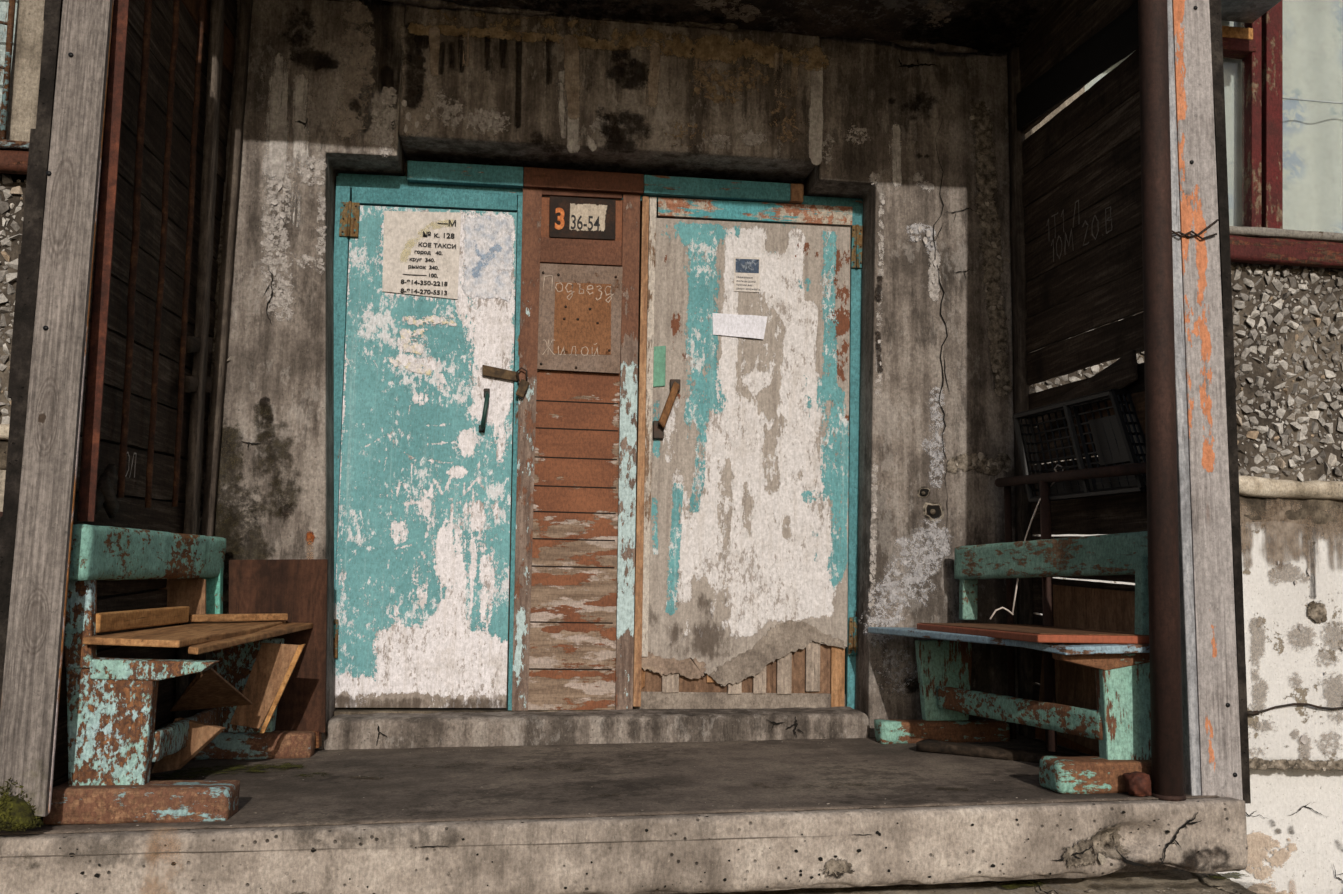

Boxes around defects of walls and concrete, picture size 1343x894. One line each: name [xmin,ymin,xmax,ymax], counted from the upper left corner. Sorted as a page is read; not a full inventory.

water stain [283,8,339,71]
water stain [353,0,871,165]
water stain [869,92,938,193]
spalling [875,193,885,396]
water stain [200,397,300,614]
spalling [867,462,879,643]
peeling [1268,561,1311,585]
water stain [1240,498,1343,598]
peeling [1249,600,1343,771]
crack [1035,812,1202,894]
peeling [1244,821,1298,894]